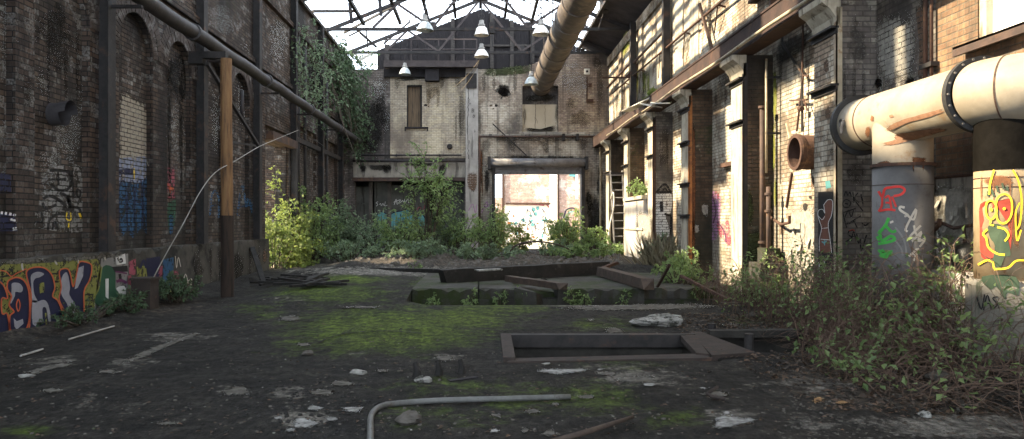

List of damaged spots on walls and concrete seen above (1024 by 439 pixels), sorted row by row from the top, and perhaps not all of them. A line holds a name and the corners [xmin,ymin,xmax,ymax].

spalling [489,85,511,109]
corrosion [884,109,946,146]